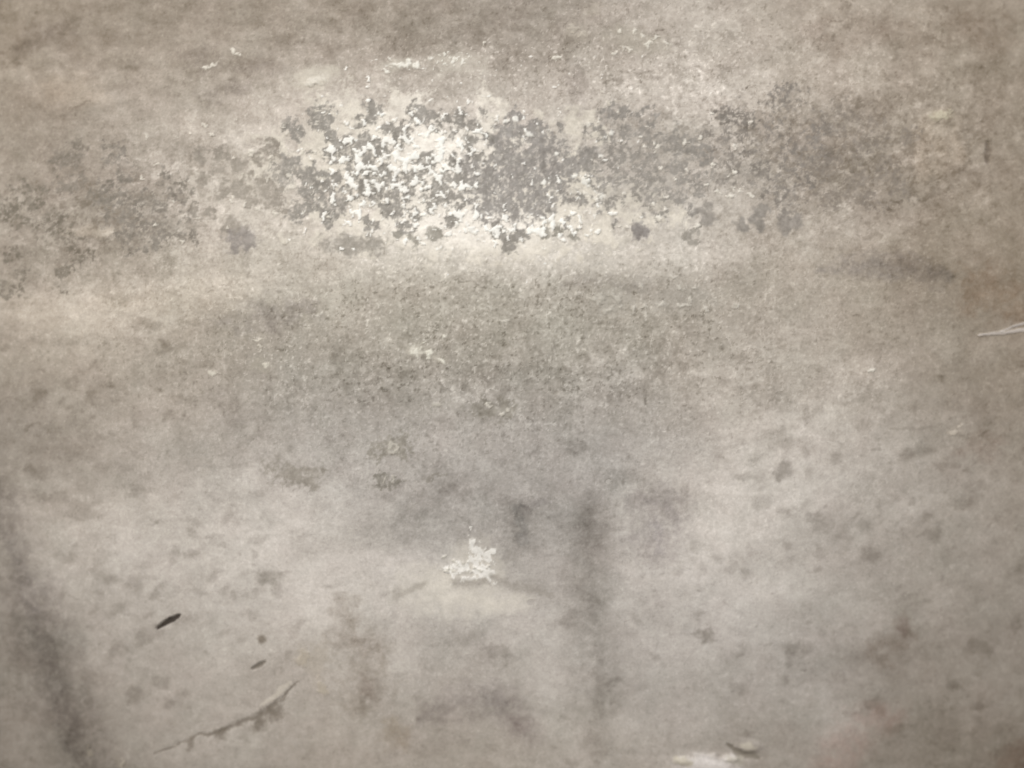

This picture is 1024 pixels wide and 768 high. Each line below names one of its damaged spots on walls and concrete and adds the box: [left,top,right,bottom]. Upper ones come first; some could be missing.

peeling [127,27,811,273]
crack [153,680,300,756]
damp [255,427,715,768]